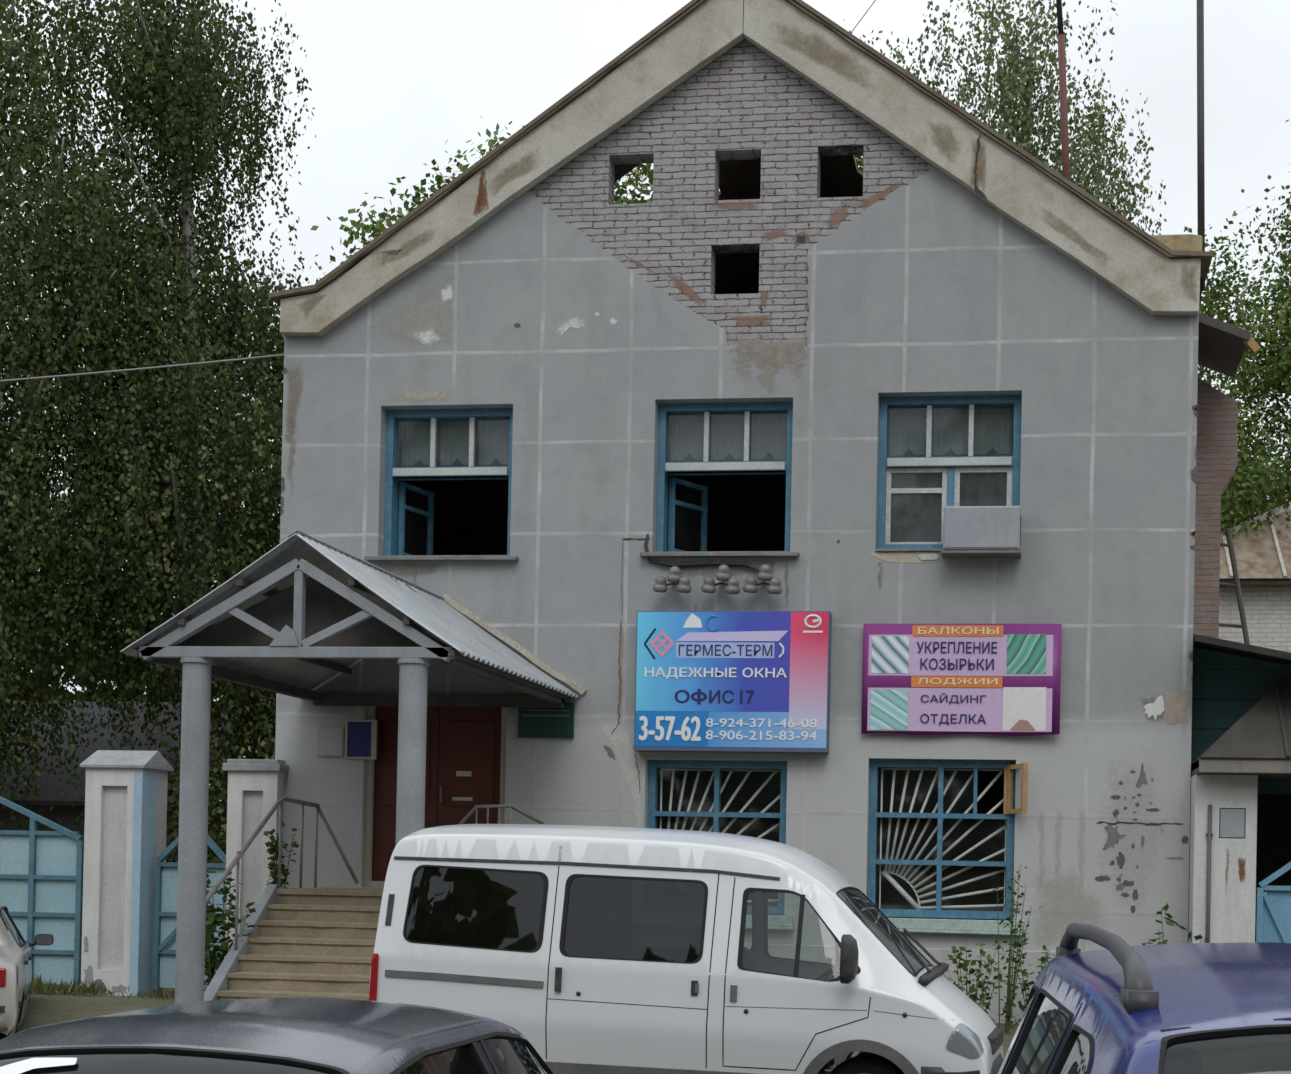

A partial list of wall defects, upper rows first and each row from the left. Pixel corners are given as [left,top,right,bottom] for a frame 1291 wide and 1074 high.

rust [474,172,487,213]
spalling [863,185,900,207]
spalling [767,230,807,246]
spalling [668,274,700,302]
spalling [1144,650,1193,726]
peeling [1095,763,1161,913]